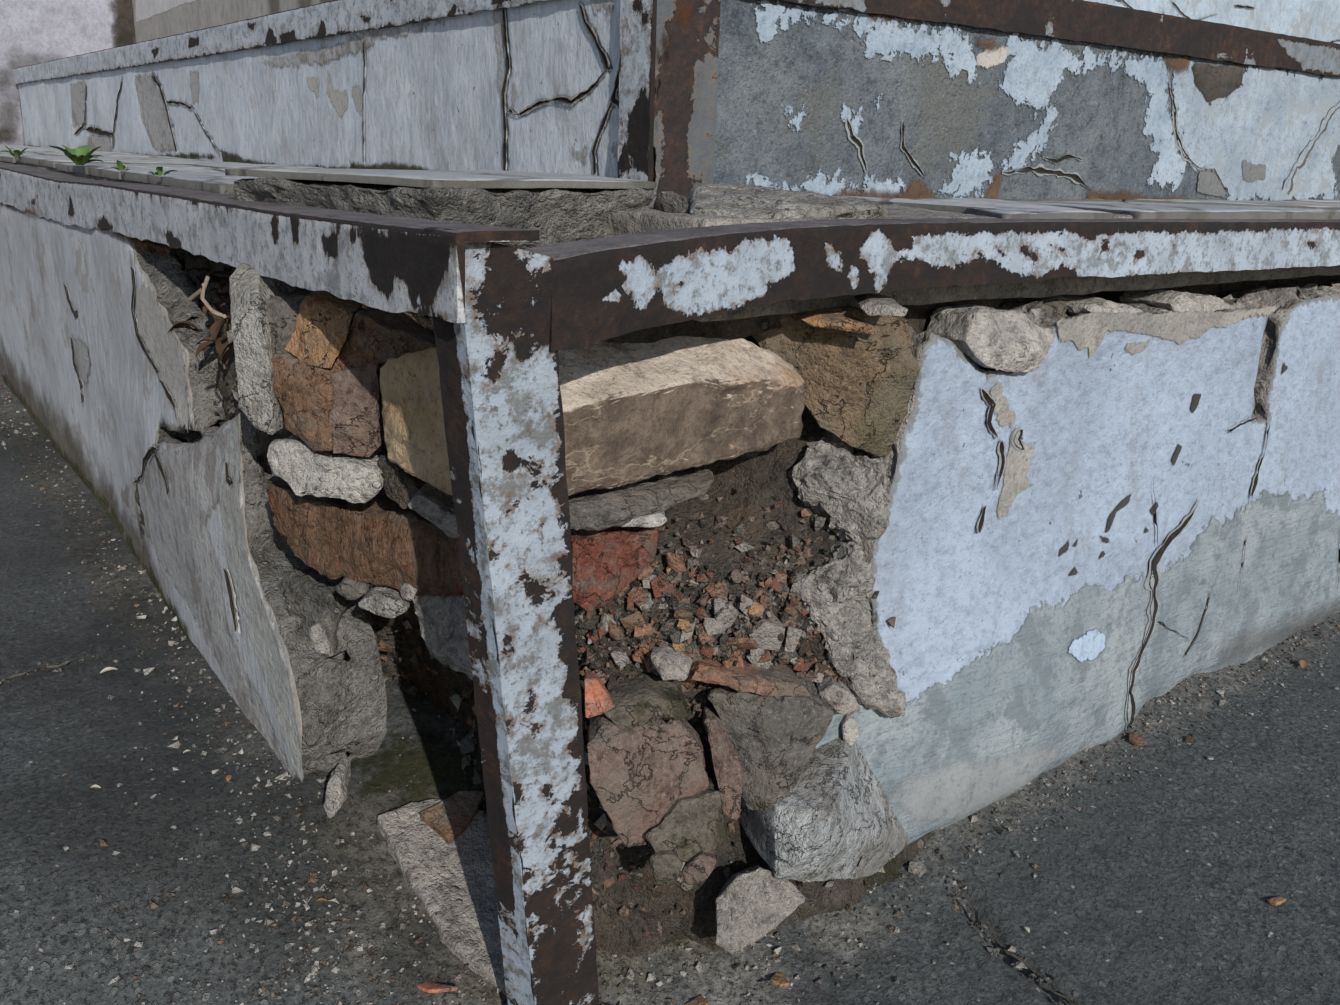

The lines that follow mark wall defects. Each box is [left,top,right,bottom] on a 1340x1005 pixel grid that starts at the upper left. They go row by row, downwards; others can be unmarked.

crack [500,1,619,175]
corrosion [978,39,995,49]
peeling [745,0,1340,201]
corrosion [1165,55,1191,72]
crack [1002,154,1093,191]
crack [129,255,180,498]
spalling [988,375,1035,518]
peeling [1057,306,1277,358]
peeling [1190,393,1201,412]
crack [1228,418,1270,503]
peeling [815,488,1340,844]
crack [1124,486,1248,728]